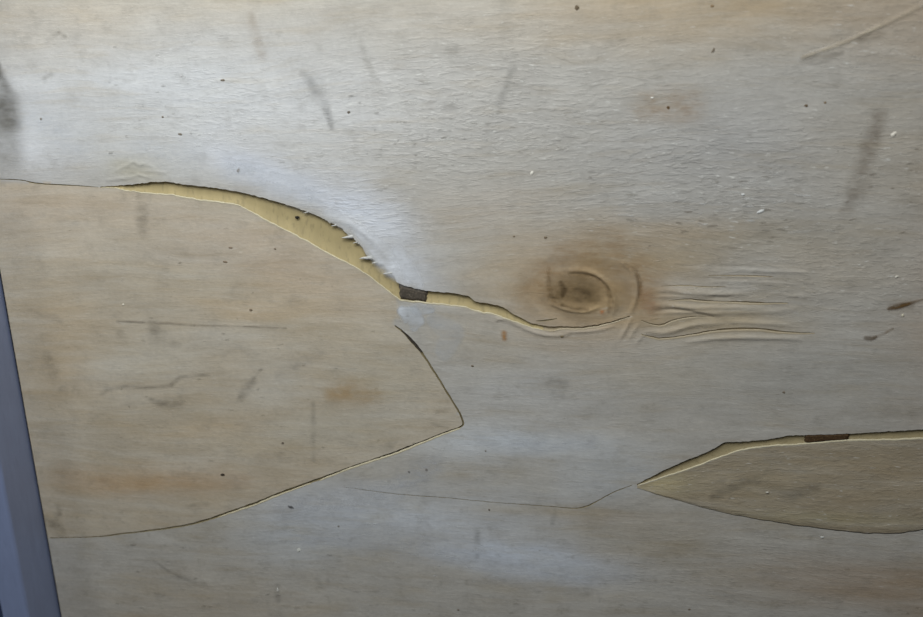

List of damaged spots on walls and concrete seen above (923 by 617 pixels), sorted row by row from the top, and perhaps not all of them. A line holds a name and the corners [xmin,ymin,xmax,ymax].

crack [2,179,630,332]
crack [53,325,632,538]
peeling [637,430,923,534]